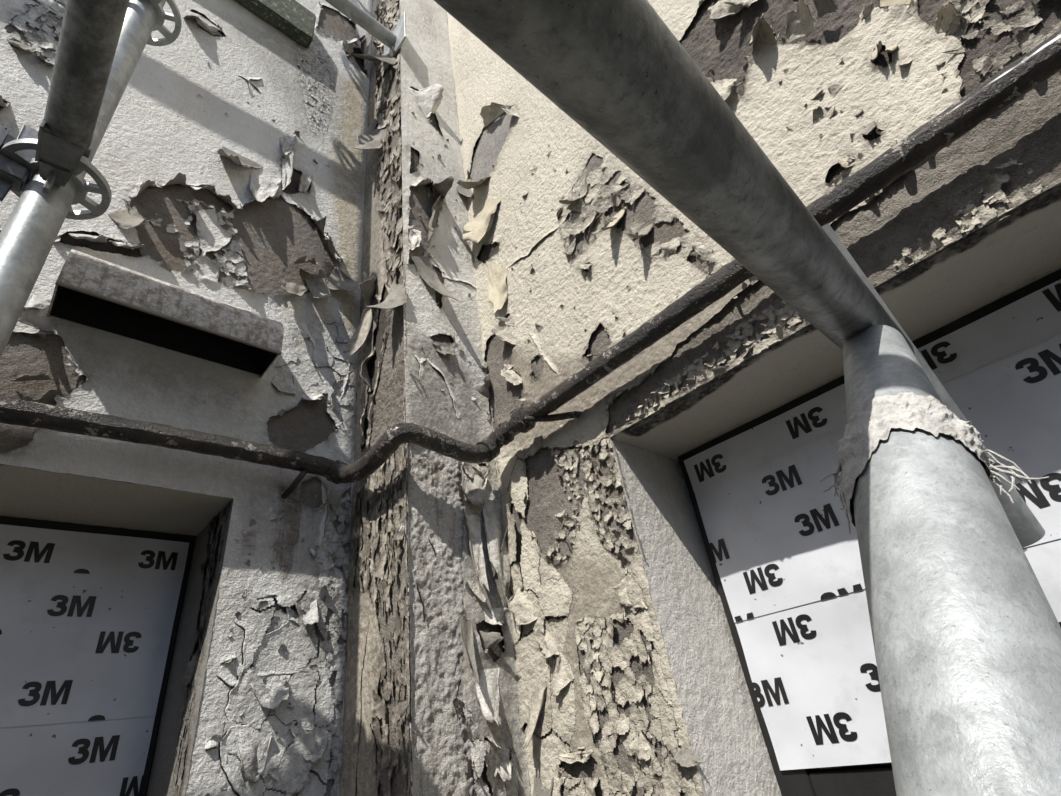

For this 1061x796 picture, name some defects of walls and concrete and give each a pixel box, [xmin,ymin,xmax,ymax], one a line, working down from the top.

peeling [0,0,67,67]
peeling [804,83,843,137]
peeling [680,0,1061,101]
peeling [55,0,544,452]
peeling [546,145,727,275]
peeling [825,71,1061,289]
peeling [0,284,87,406]
peeling [0,423,40,453]
peeling [204,276,814,796]
peeling [171,502,282,796]
crack [205,587,318,796]